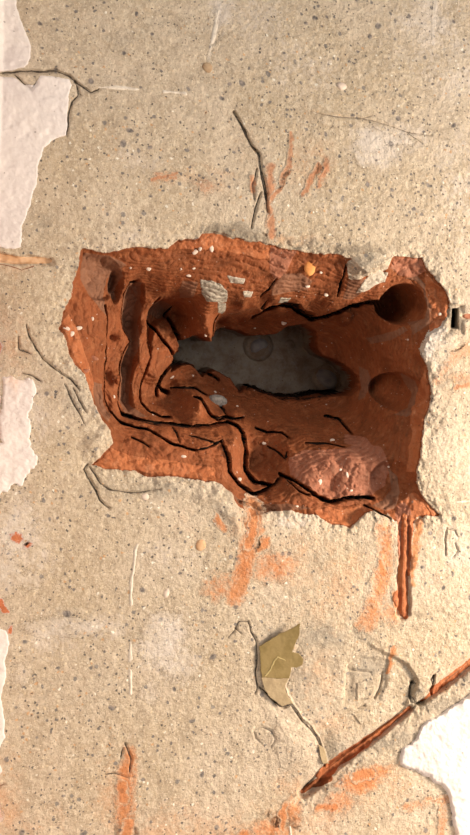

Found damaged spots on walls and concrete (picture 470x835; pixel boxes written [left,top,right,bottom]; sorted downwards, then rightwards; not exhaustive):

peeling [0,0,72,249]
crack [0,70,98,135]
crack [233,112,268,228]
peeling [0,376,38,494]
crack [83,464,160,507]
spalling [59,233,449,528]
rust [197,493,302,609]
crack [228,621,321,746]
rust [113,743,141,835]
rust [210,793,304,835]
rust [314,763,397,818]
peeling [400,694,470,835]